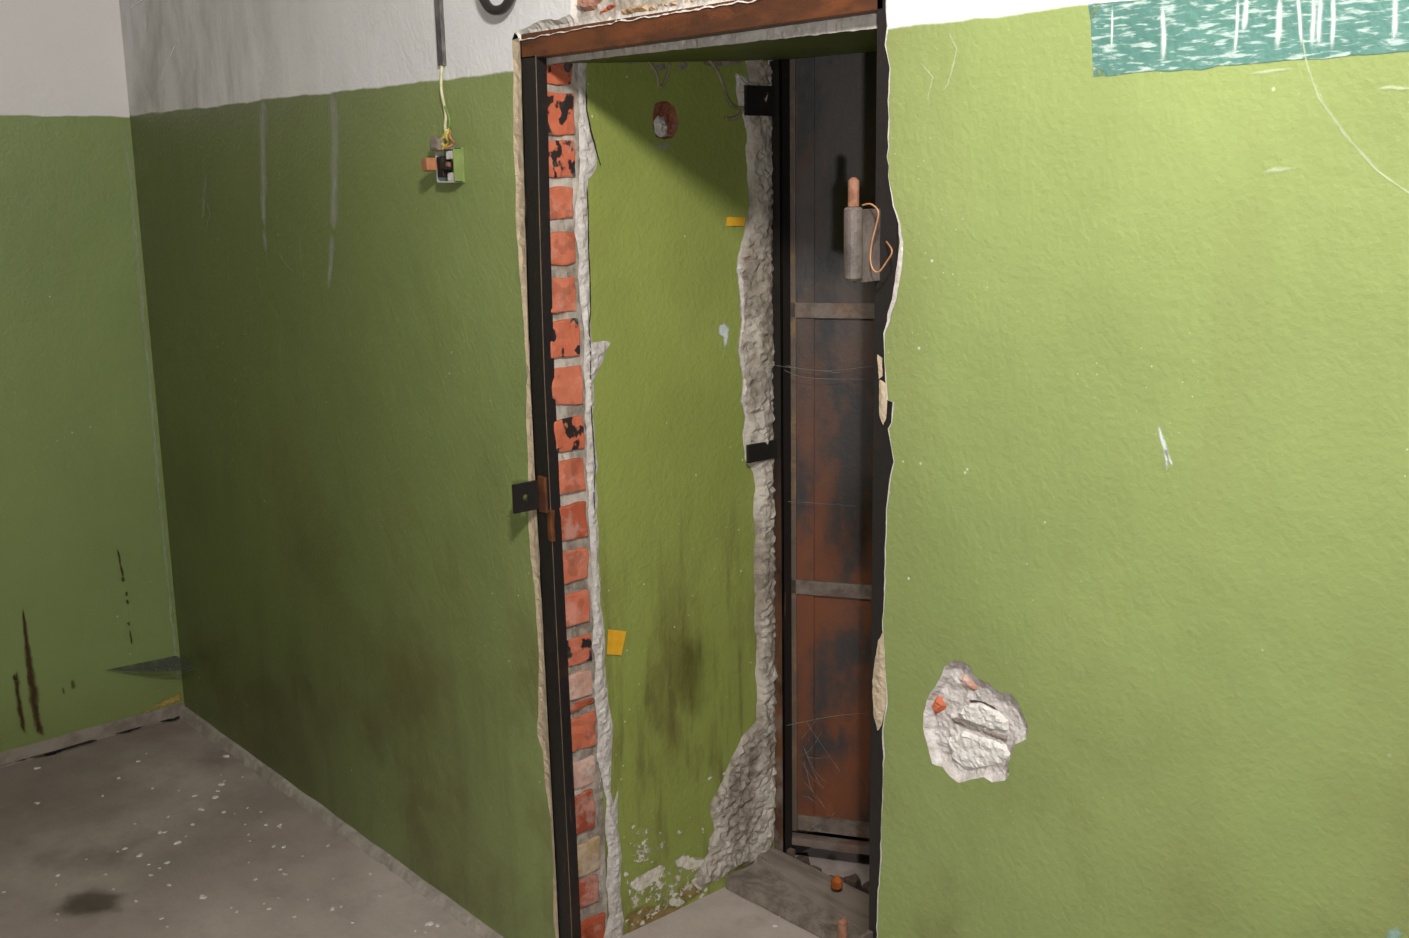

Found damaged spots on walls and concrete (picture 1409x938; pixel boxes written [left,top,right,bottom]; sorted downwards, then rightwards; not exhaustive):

flaking render [512,0,903,938]
rust [13,611,43,734]
flaking render [923,661,1028,783]